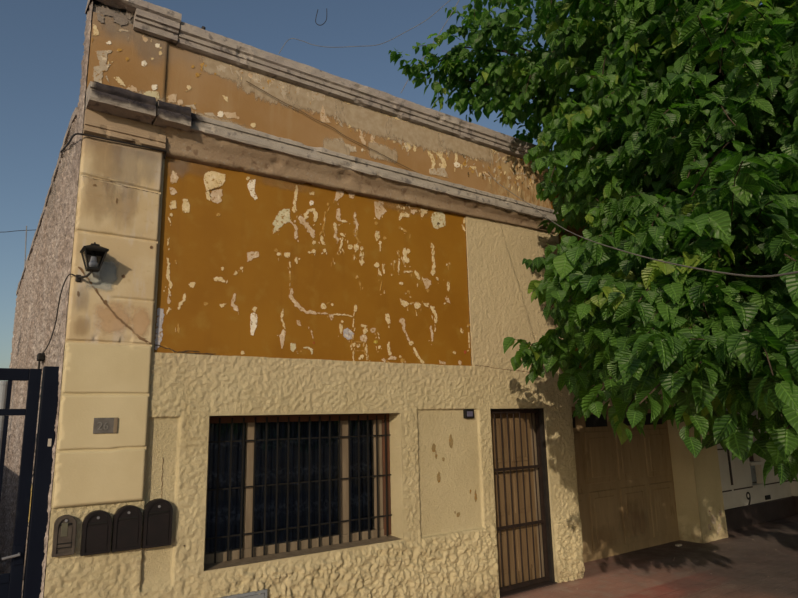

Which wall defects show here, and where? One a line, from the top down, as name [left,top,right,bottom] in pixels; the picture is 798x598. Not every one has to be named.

peeling [92,41,239,119]
damp [93,81,245,128]
peeling [168,171,190,226]
peeling [204,171,226,216]
peeling [246,176,258,200]
peeling [272,185,364,266]
peeling [374,201,387,251]
peeling [396,203,446,238]
peeling [155,238,195,354]
peeling [250,307,258,335]
peeling [274,248,406,363]
peeling [374,243,451,364]